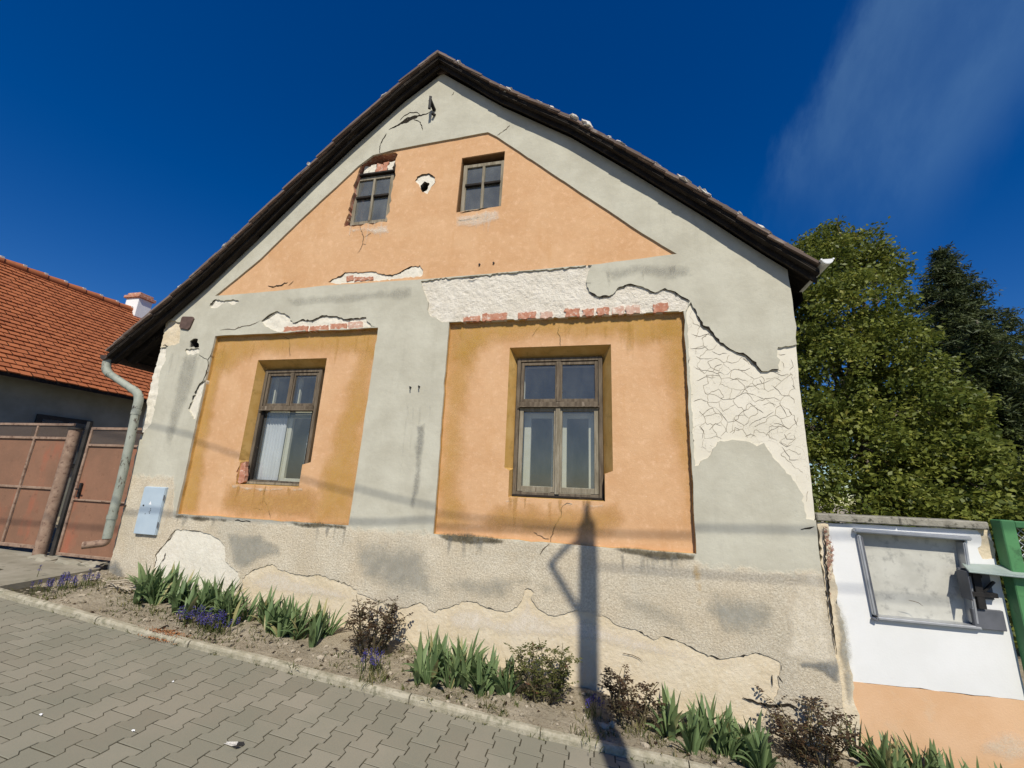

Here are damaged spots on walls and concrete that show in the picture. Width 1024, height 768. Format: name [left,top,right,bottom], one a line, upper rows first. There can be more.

crack [379,112,429,152]
spalling [359,161,396,178]
flaking render [262,312,372,334]
flaking render [189,372,209,419]
flaking render [330,266,815,520]
crack [590,284,808,536]
flaking render [154,529,780,726]